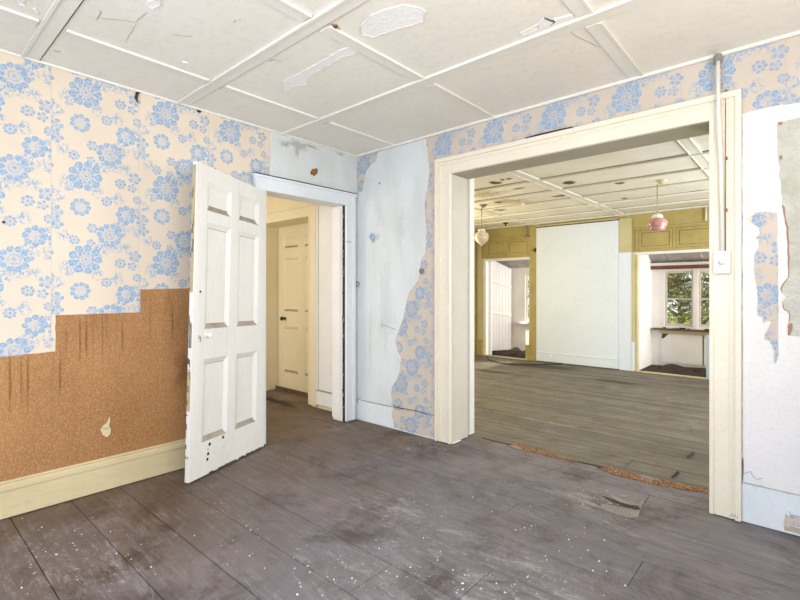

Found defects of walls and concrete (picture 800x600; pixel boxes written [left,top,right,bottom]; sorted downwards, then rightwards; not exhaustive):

crack [96,9,146,42]
peeling [282,47,357,91]
peeling [361,5,426,37]
peeling [0,288,190,482]
peeling [270,132,429,407]
peeling [742,103,800,495]